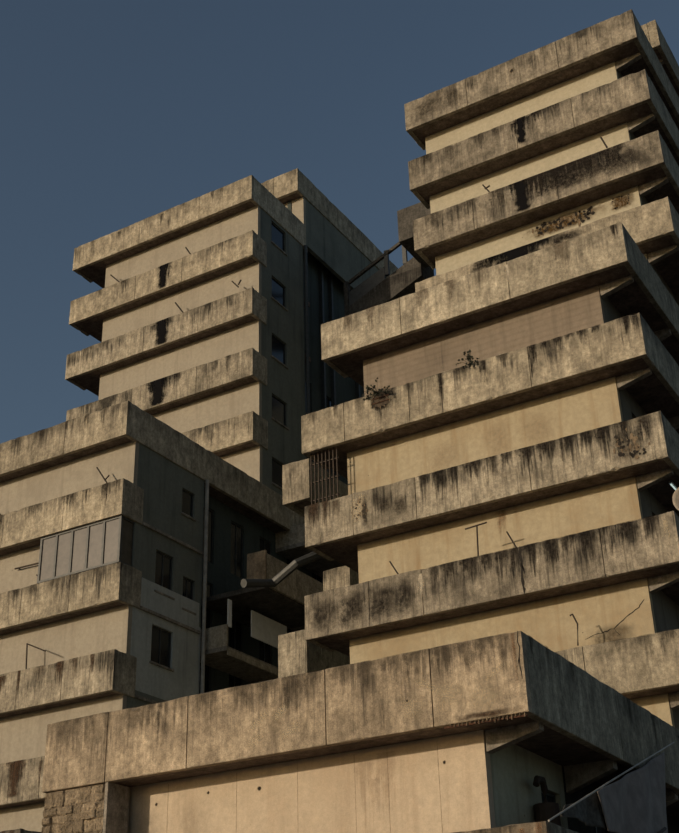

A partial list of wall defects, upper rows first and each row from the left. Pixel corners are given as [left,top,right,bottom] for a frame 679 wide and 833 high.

damp [510,109,541,143]
damp [490,144,634,212]
damp [147,372,180,406]
damp [420,420,628,500]
damp [618,516,669,540]
damp [431,547,517,582]
damp [526,526,613,574]
damp [314,585,410,626]
crack [585,600,644,640]